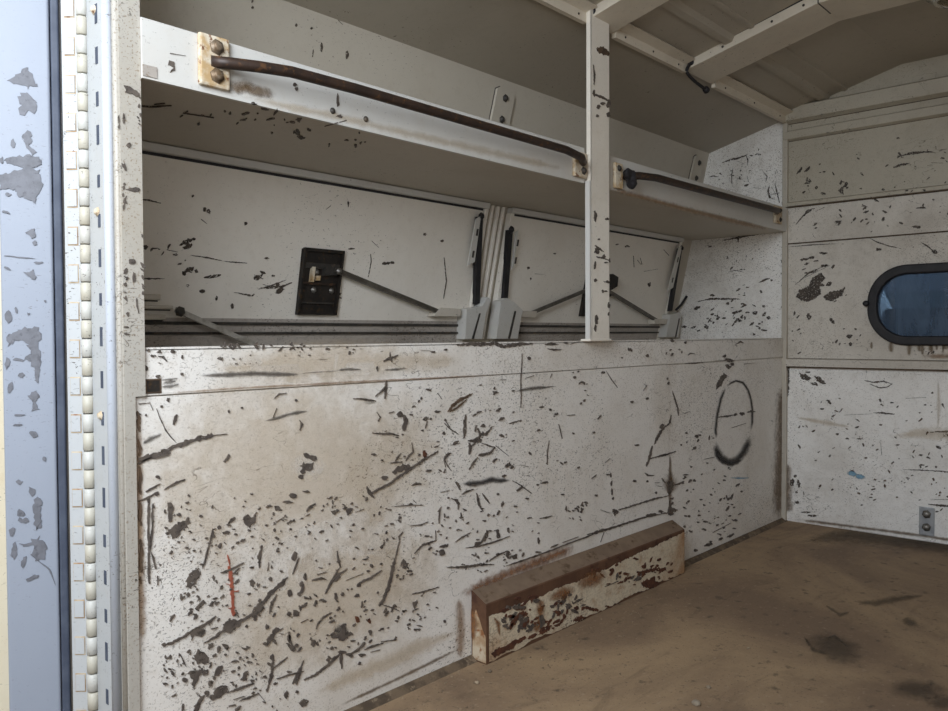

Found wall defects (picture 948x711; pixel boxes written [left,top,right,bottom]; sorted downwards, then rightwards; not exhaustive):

rust [234,82,269,96]
peeling [0,130,43,203]
peeling [791,244,846,341]
peeling [4,307,42,438]
peeling [136,398,170,526]
peeling [298,453,317,479]
peeling [9,479,55,583]
peeling [162,490,439,711]
peeling [419,486,539,573]
rust [471,549,567,592]
peeling [491,590,613,658]
peeling [590,556,673,588]